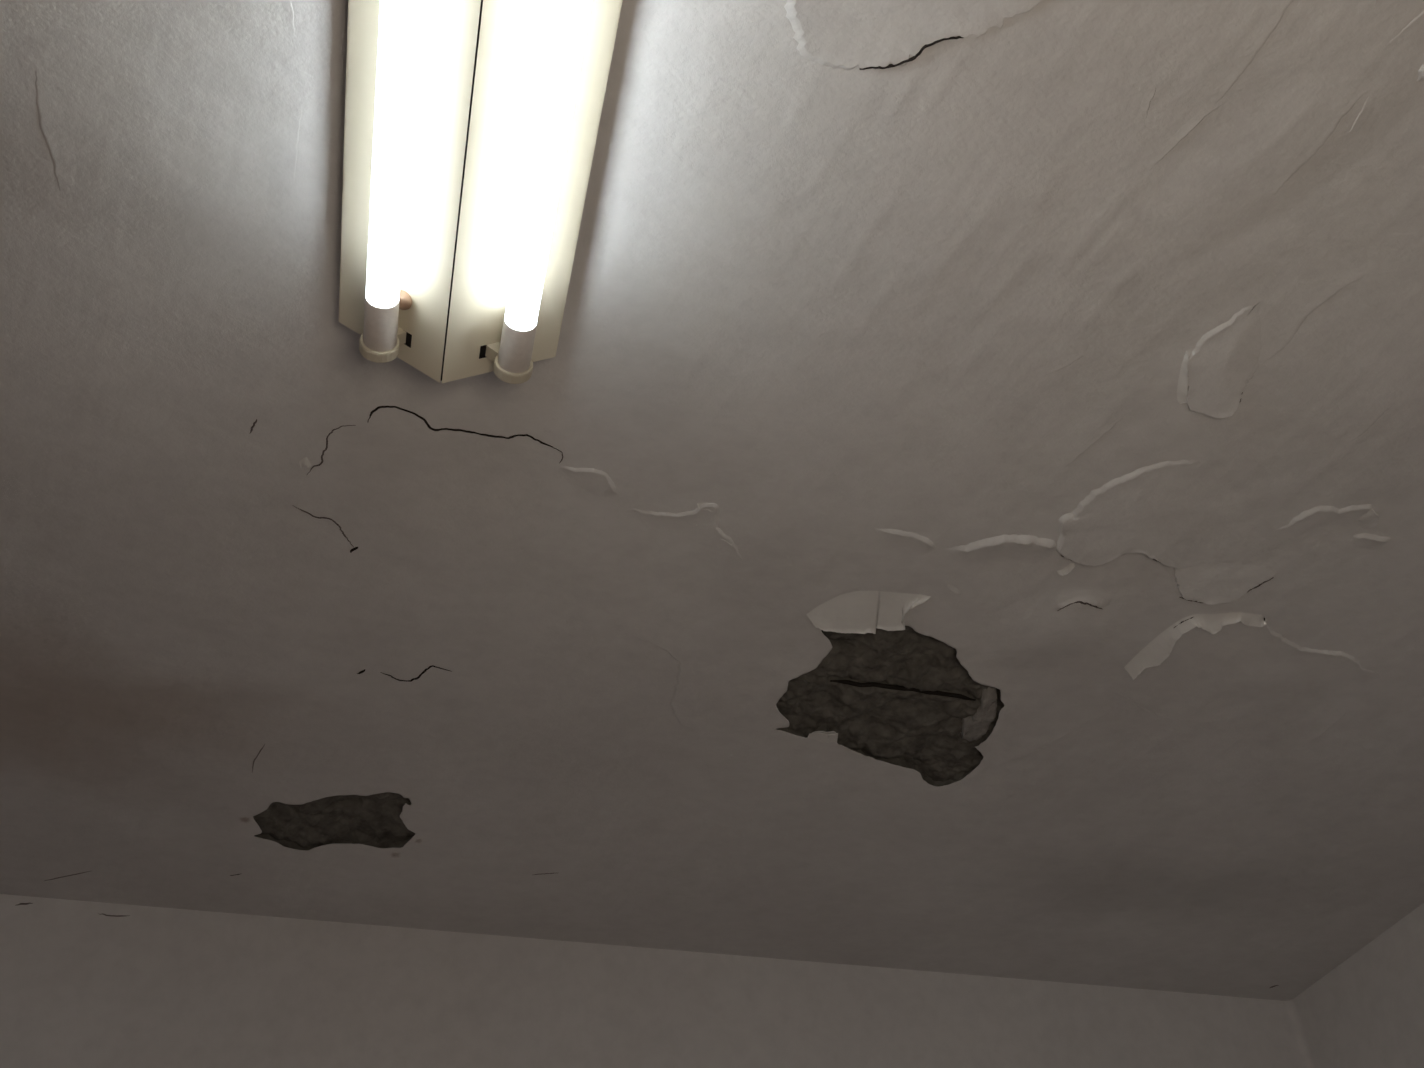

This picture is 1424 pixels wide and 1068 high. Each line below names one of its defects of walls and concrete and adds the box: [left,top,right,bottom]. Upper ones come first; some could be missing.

peeling [784,0,1041,71]
crack [292,406,563,553]
peeling [945,534,1116,611]
crack [357,665,452,682]
spalling [764,591,1017,792]
spalling [242,786,425,855]